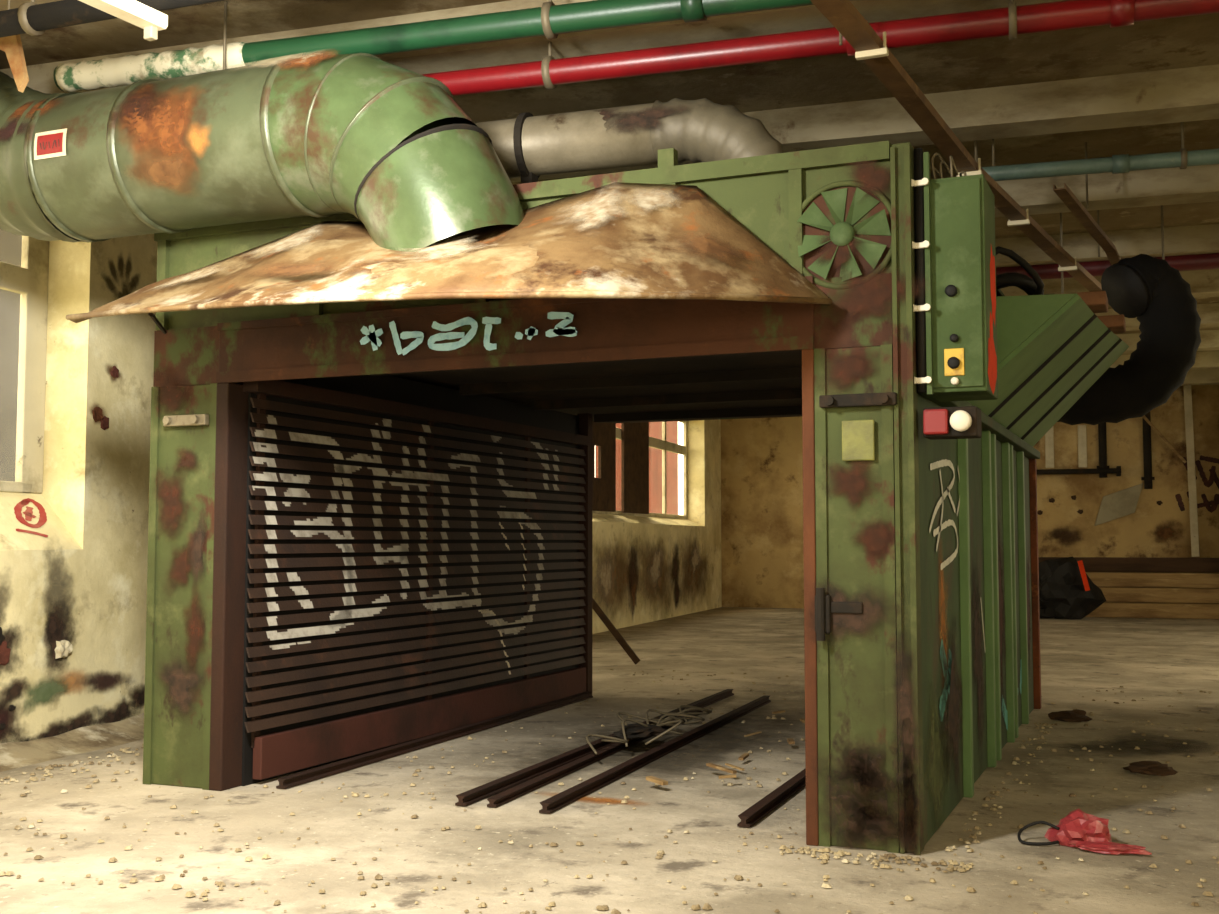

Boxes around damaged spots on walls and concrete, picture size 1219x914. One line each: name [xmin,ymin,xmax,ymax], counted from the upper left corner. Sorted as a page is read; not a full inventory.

leakage [1051,529,1081,545]
leakage [1154,522,1182,542]
spalling [0,586,19,670]
spalling [44,560,73,668]
leakage [596,541,707,614]